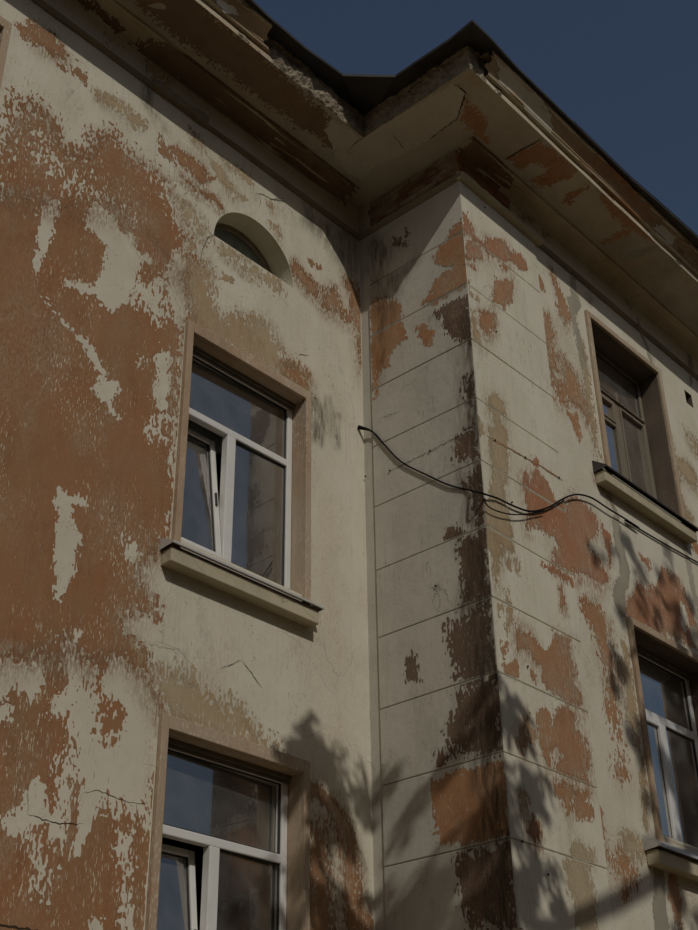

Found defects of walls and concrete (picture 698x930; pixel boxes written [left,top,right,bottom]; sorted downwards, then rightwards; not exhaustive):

peeling [128,0,362,207]
crack [430,85,466,139]
peeling [290,211,604,462]
peeling [0,18,317,930]
peeling [672,422,698,525]
peeling [403,648,423,684]
peeling [430,371,649,930]
peeling [625,553,696,648]
peeling [310,781,374,930]